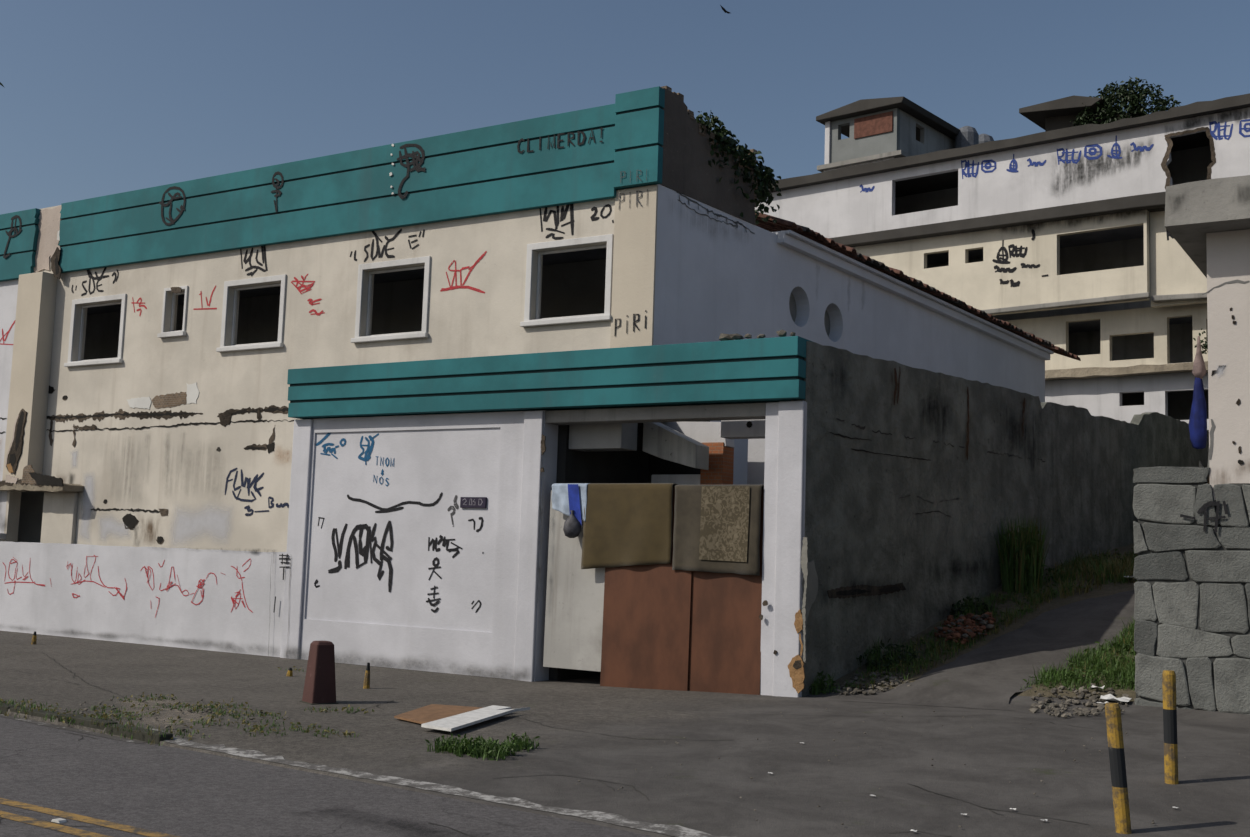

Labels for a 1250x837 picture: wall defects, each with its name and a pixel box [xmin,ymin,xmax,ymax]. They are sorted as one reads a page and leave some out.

water stain [1057,151,1141,189]
spalling [1161,127,1216,190]
spalling [46,382,298,447]
spalling [0,409,64,488]
spalling [788,537,906,694]